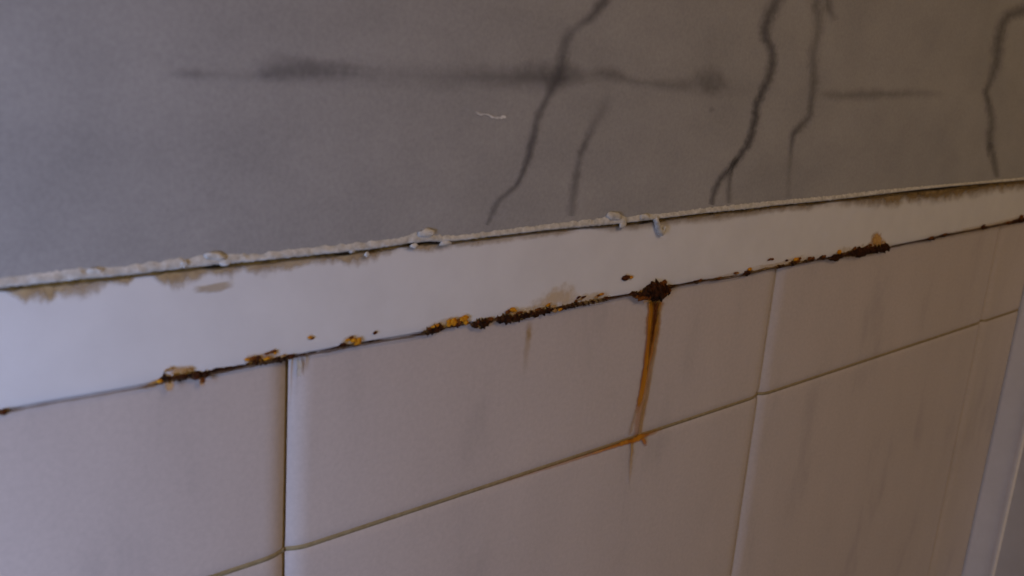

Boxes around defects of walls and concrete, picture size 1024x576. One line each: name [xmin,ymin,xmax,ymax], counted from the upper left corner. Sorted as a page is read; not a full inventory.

crack [714,16,774,192]
corrosion [0,403,49,415]
corrosion [119,215,1024,462]